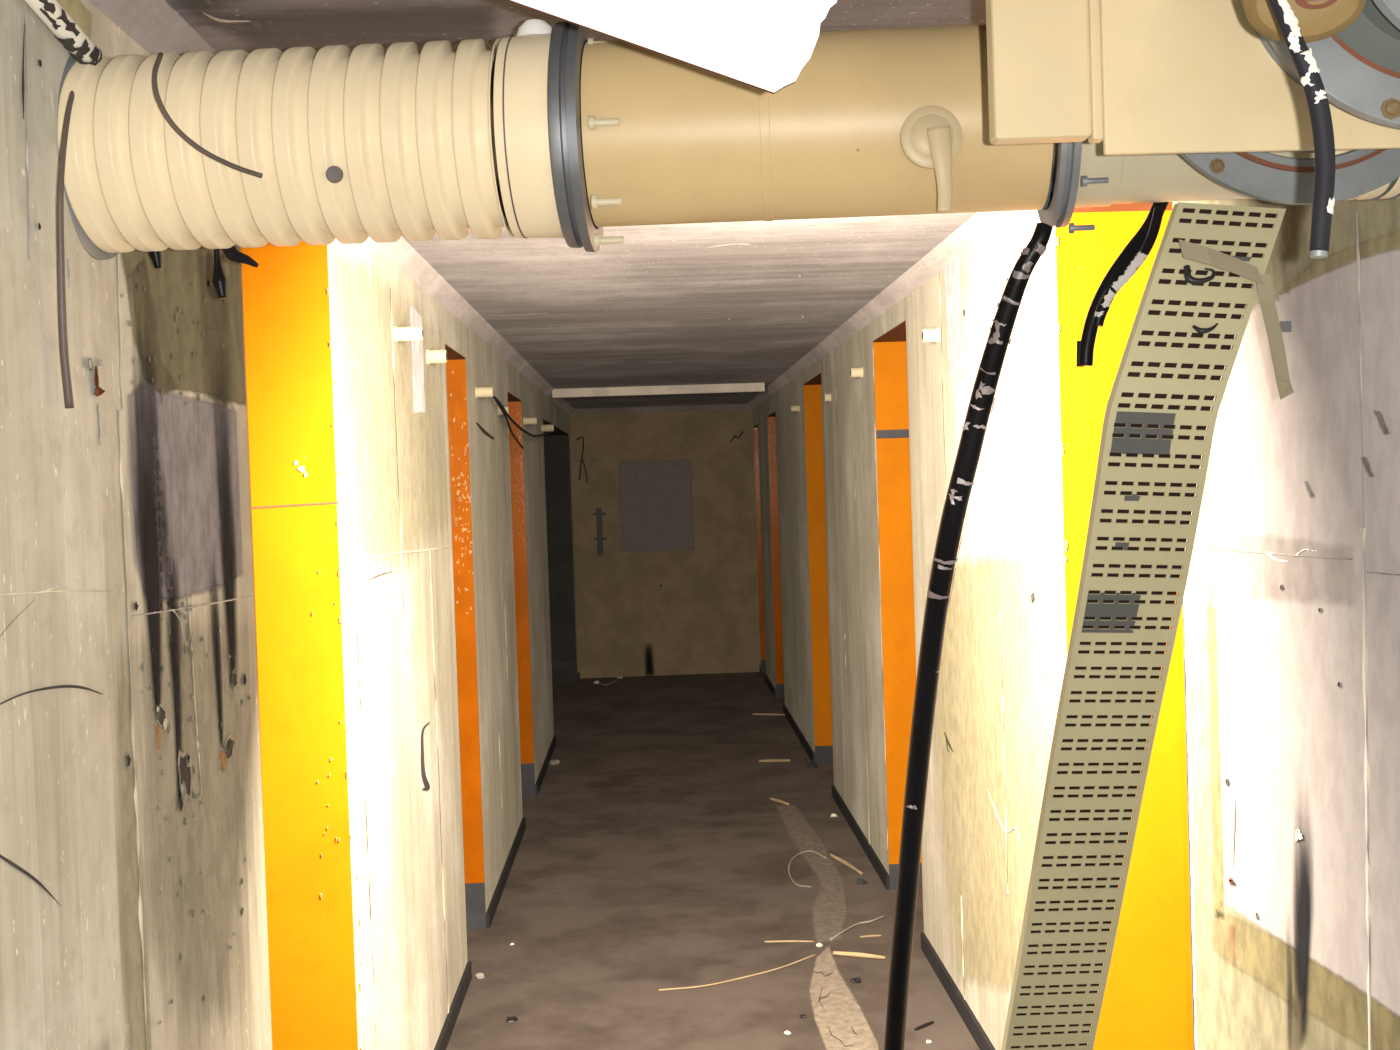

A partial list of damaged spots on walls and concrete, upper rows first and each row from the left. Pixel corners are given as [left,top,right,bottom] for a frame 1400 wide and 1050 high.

damp [121,245,246,601]
crack [0,586,253,637]
damp [1177,198,1400,1050]